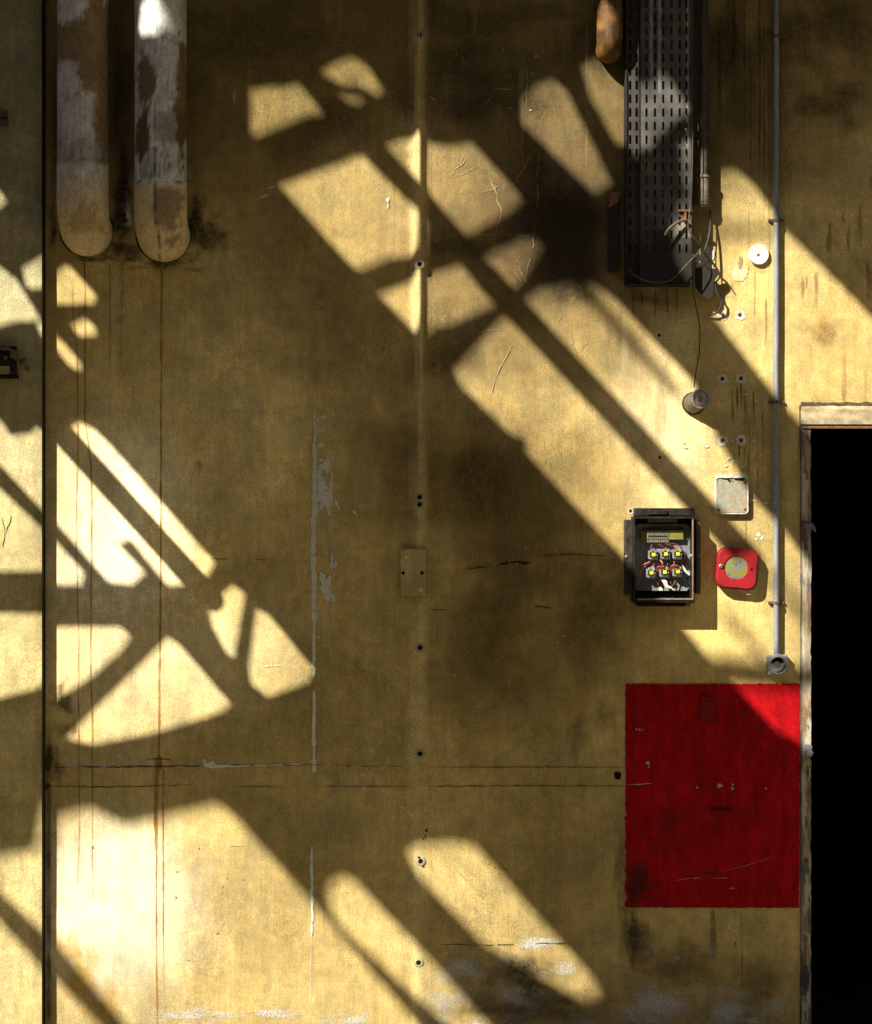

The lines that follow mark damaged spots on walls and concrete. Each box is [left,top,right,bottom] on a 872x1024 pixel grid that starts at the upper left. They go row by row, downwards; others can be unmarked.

crack [451,98,590,290]
corrosion [77,341,92,505]
corrosion [150,428,170,945]
peeling [198,411,339,773]